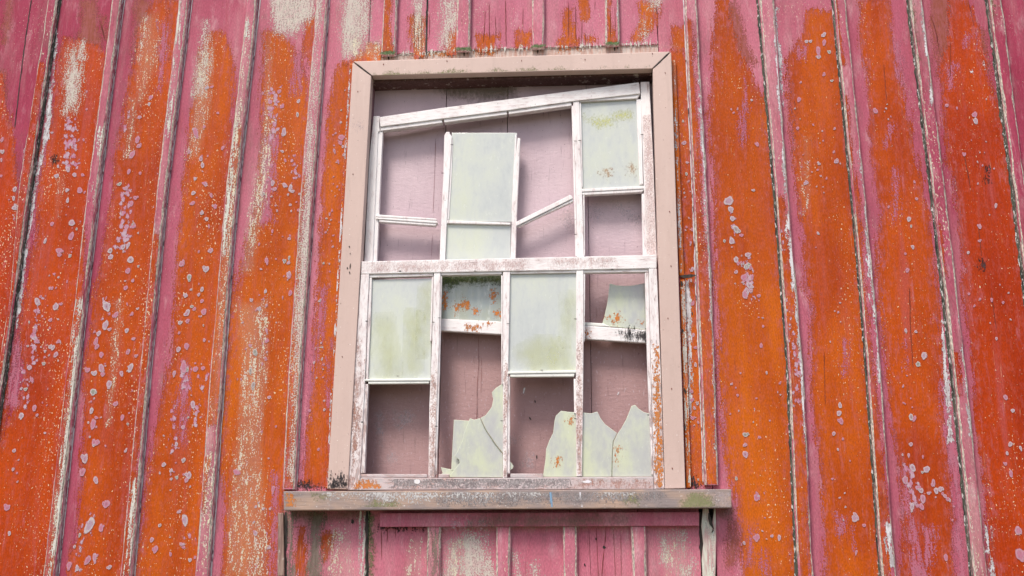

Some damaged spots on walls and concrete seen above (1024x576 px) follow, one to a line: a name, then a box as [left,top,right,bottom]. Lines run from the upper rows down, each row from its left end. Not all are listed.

peeling [0,0,470,576]
peeling [441,527,496,576]
water stain [618,325,646,342]
peeling [468,0,1024,576]